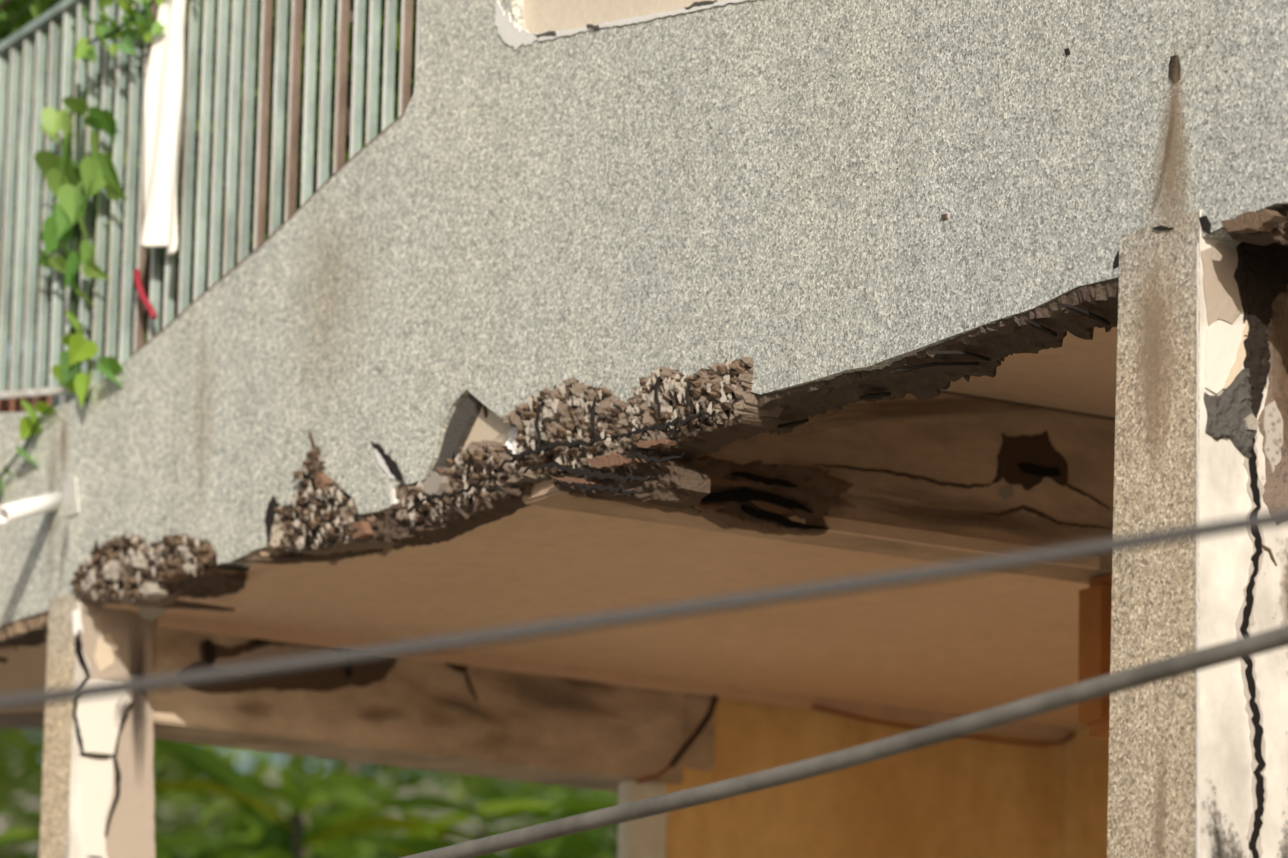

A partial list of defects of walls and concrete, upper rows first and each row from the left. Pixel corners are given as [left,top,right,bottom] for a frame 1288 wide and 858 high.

spalling [252,278,1119,565]
crack [701,464,1111,530]
spalling [1199,205,1288,639]
spalling [0,612,49,651]
crack [0,627,134,858]
flaking render [71,535,247,858]
spalling [182,639,396,693]
spalling [445,663,468,673]
spalling [1240,656,1267,858]
crack [1240,437,1277,858]